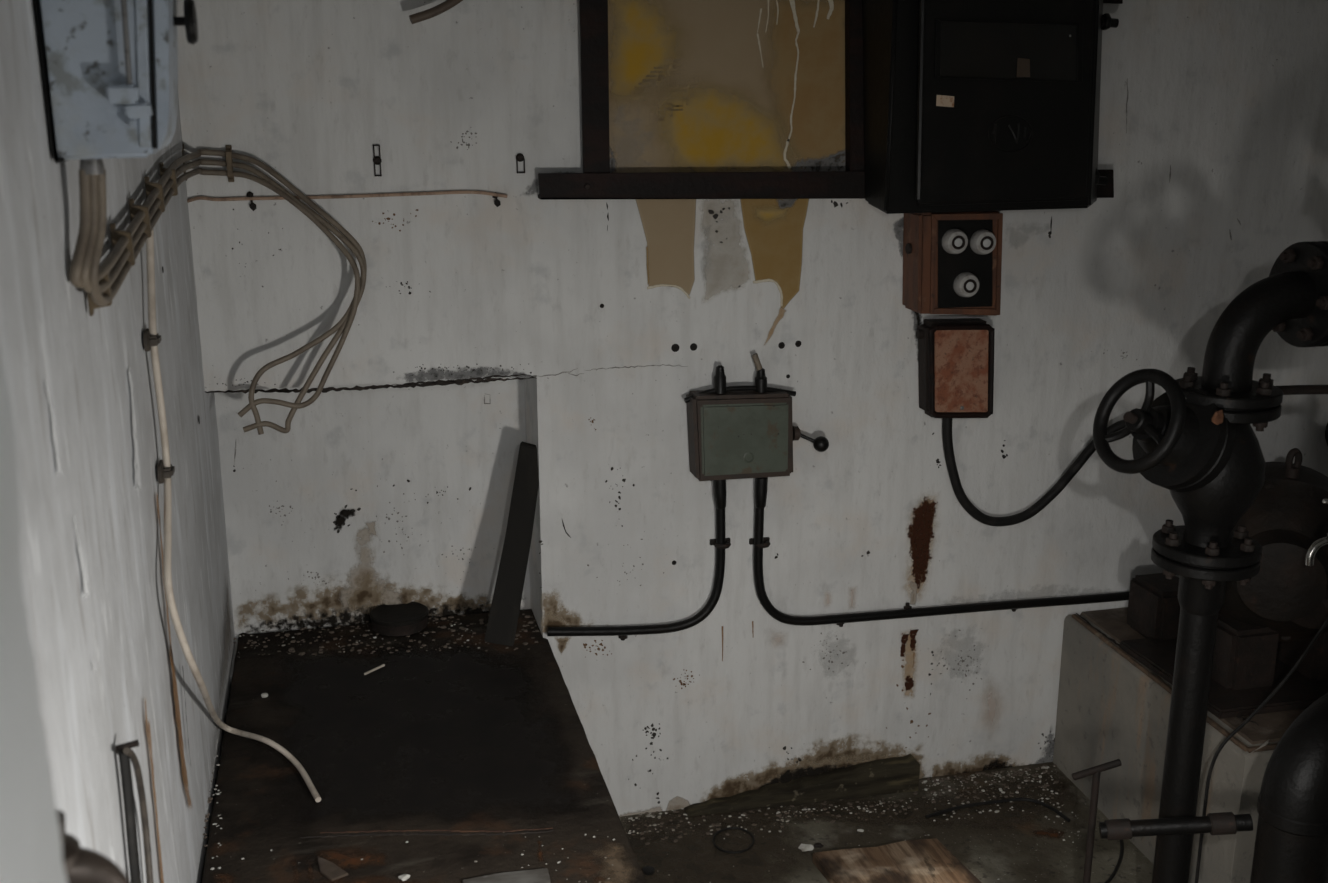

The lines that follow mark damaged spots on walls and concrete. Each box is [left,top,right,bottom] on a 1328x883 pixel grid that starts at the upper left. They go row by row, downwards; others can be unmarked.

peeling [636,199,809,349]
crack [205,363,686,394]
corrosion [156,495,191,806]
water stain [221,479,491,702]
corrosion [896,629,931,748]
corrosion [908,497,936,604]
corrosion [145,700,164,883]
water stain [619,731,1055,817]